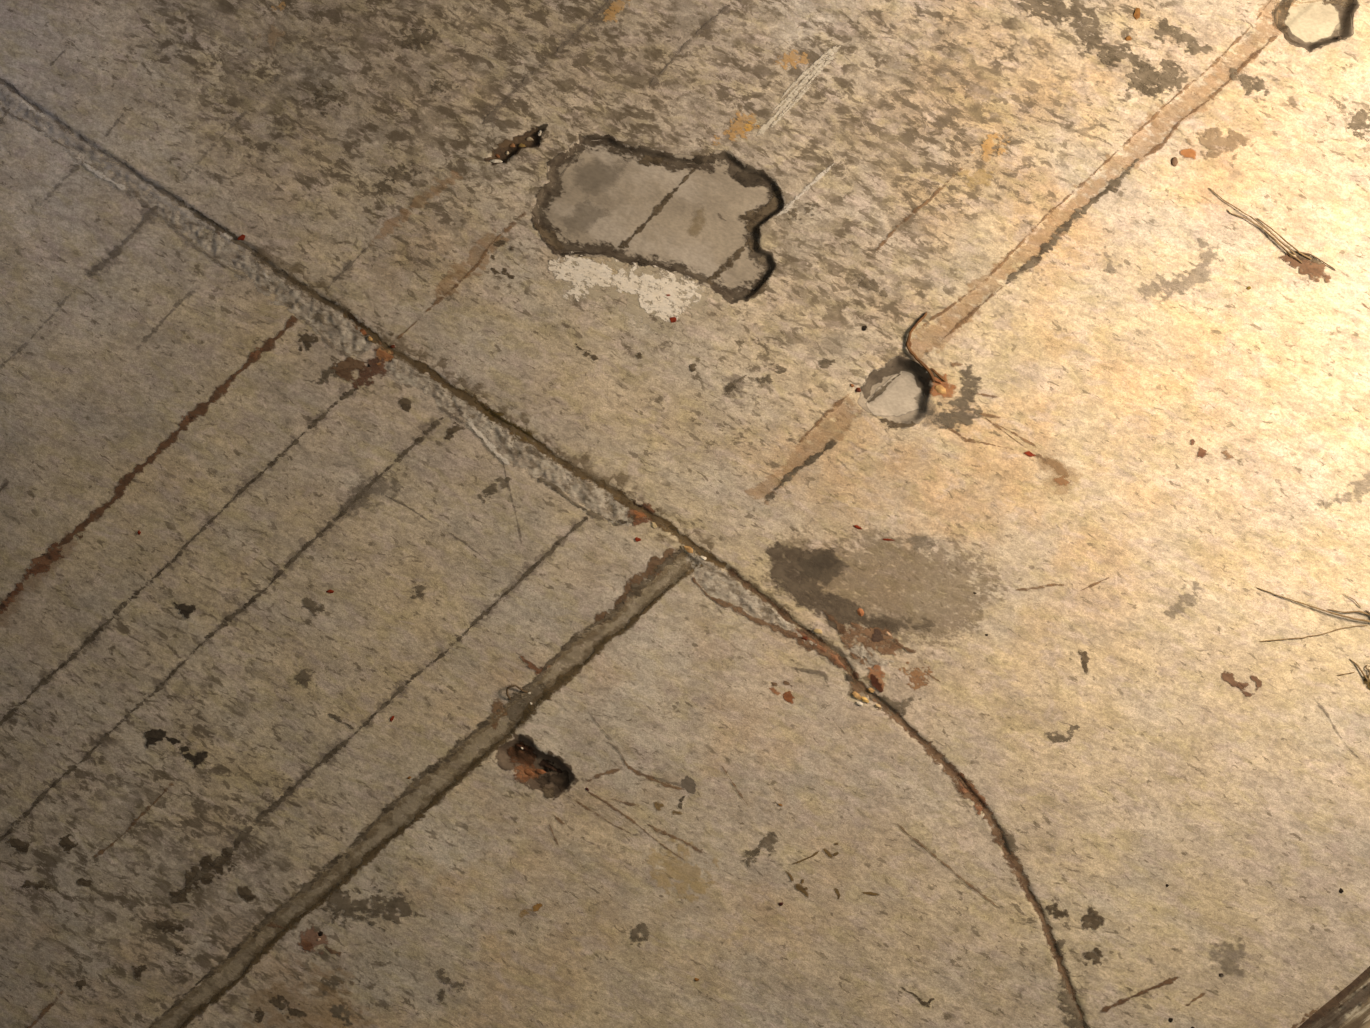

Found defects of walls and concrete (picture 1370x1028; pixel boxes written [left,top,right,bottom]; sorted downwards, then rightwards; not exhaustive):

spalling [484,124,548,165]
damp [548,251,727,337]
spalling [532,133,786,304]
corrosion [0,316,298,614]
crack [0,78,1178,1028]
damp [766,541,934,635]